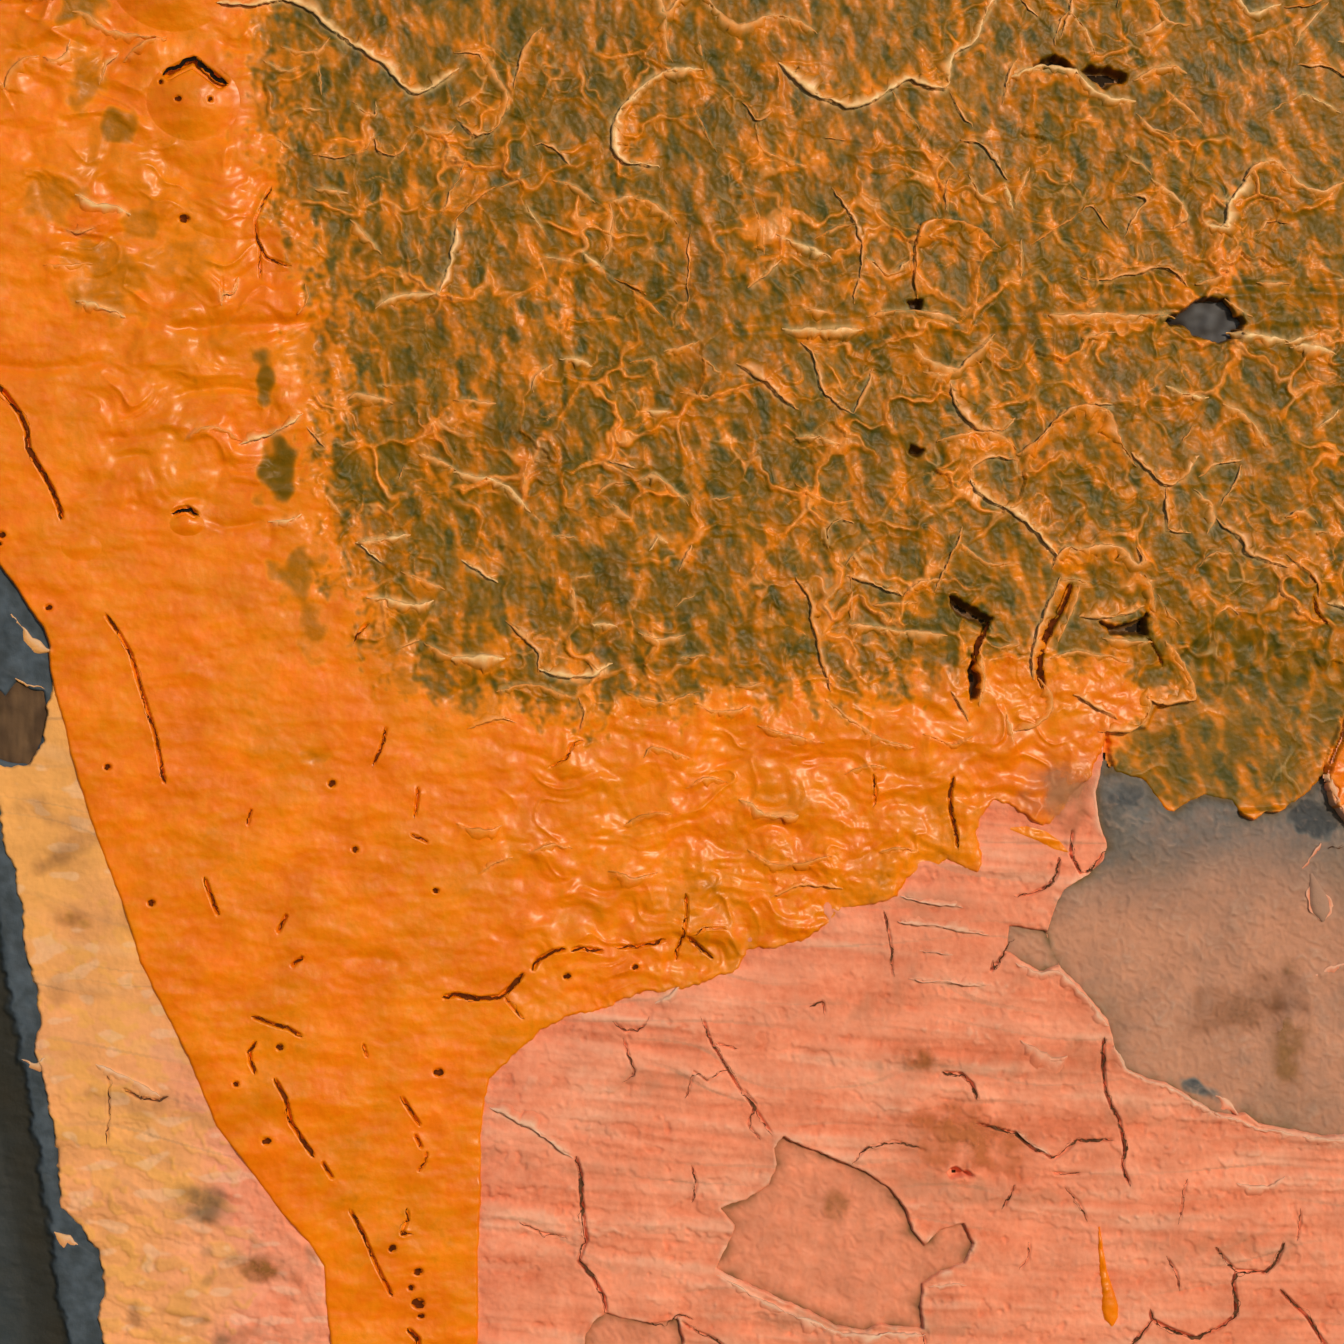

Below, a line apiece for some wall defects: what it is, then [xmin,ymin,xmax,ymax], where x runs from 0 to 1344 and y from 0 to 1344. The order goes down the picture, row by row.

crack [0,385,62,519]
spalling [0,681,47,765]
crack [108,616,166,783]
crack [1036,584,1072,689]
crack [442,895,726,1019]
spalling [1006,725,1344,1145]
crack [943,1038,1131,1220]
crack [352,1214,393,1295]
crack [522,1156,605,1312]
spalling [585,1313,686,1344]
spalling [716,1137,972,1344]
crack [1132,1208,1323,1344]